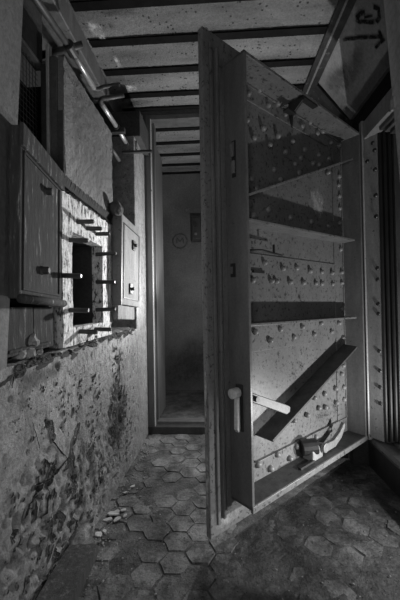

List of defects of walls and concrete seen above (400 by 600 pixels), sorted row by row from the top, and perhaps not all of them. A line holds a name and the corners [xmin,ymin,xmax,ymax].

spalling [5,373,127,600]
spalling [14,328,135,462]